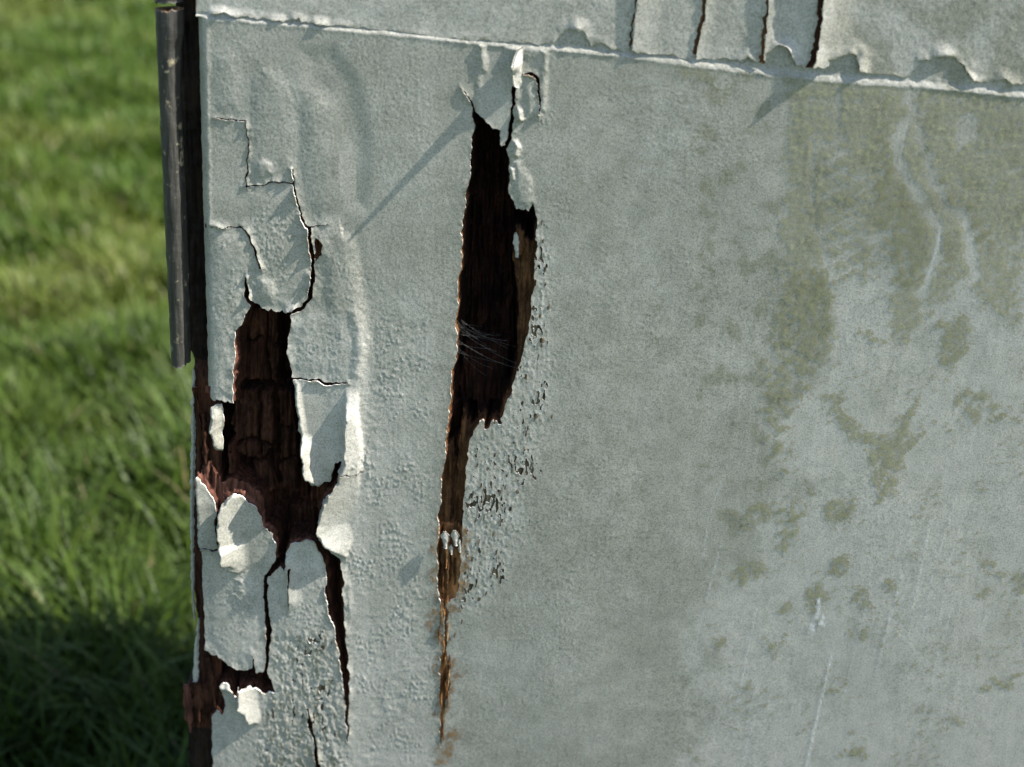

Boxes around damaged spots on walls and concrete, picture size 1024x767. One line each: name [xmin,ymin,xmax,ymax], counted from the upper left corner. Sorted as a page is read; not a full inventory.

crack [629,0,638,47]
crack [692,0,706,54]
crack [758,0,769,64]
crack [806,0,823,68]
peeling [896,41,982,82]
crack [216,117,323,314]
crack [205,224,261,307]
spalling [440,0,863,638]
peeling [195,380,353,767]